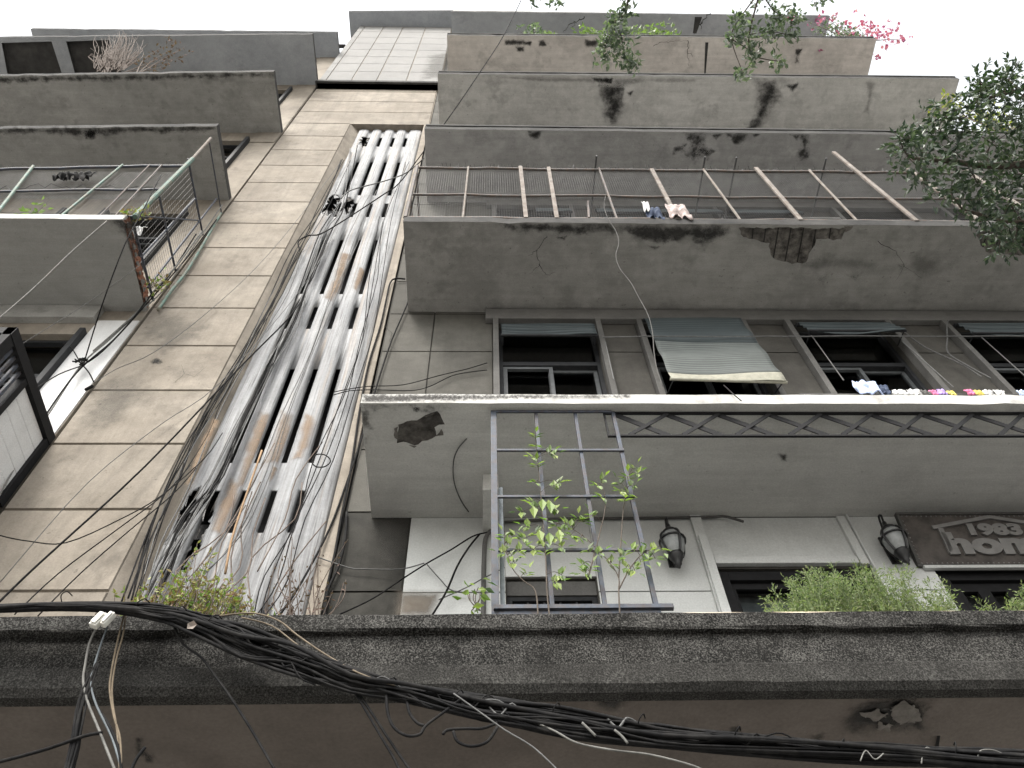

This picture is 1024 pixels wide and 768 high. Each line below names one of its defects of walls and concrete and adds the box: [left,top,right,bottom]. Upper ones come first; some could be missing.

leakage [674,83,775,157]
spalling [739,226,853,264]
spalling [394,411,444,448]
peeling [848,699,923,732]